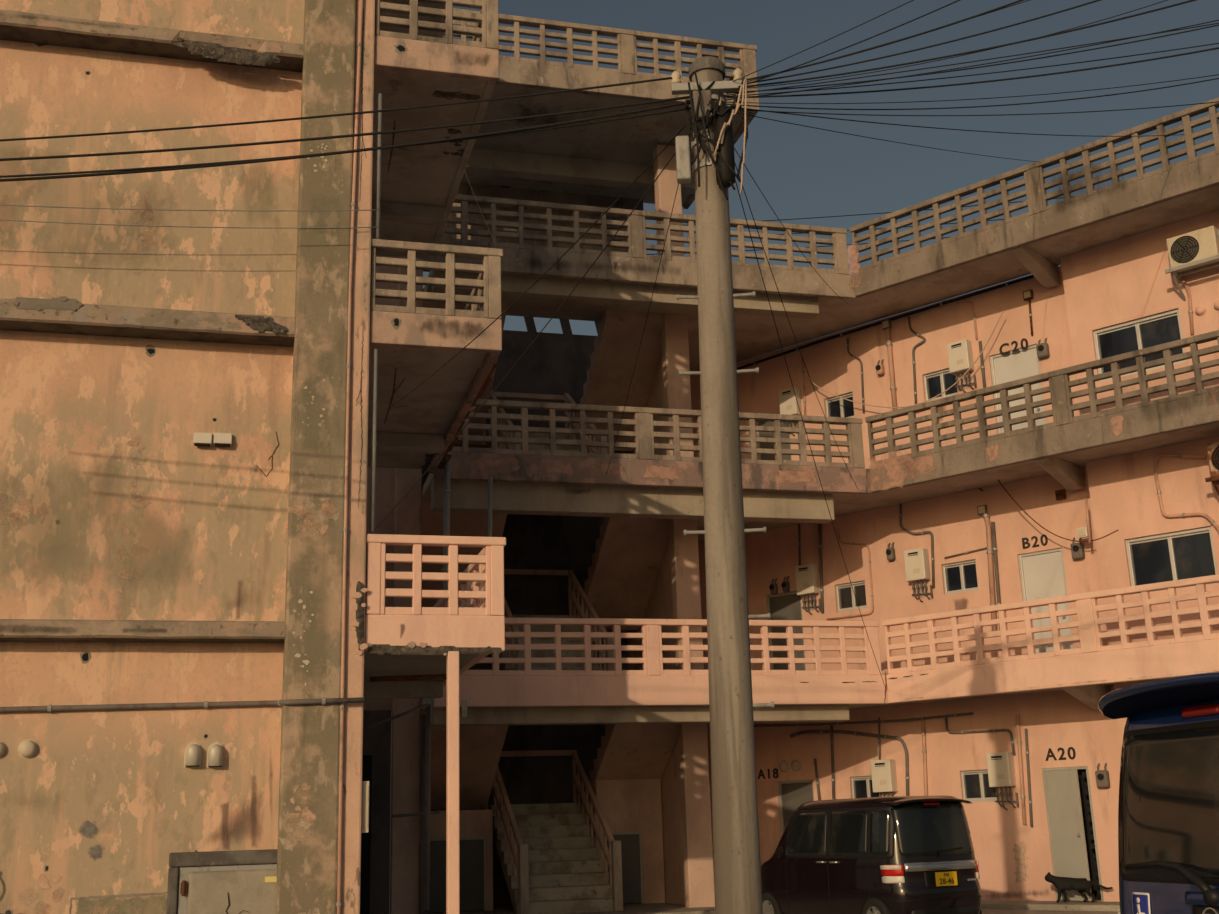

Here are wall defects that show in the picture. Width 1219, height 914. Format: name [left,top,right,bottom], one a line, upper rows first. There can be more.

spalling [177,38,281,66]
spalling [235,314,287,335]
crack [256,432,280,477]
spalling [351,581,502,656]
leakage [222,798,255,848]